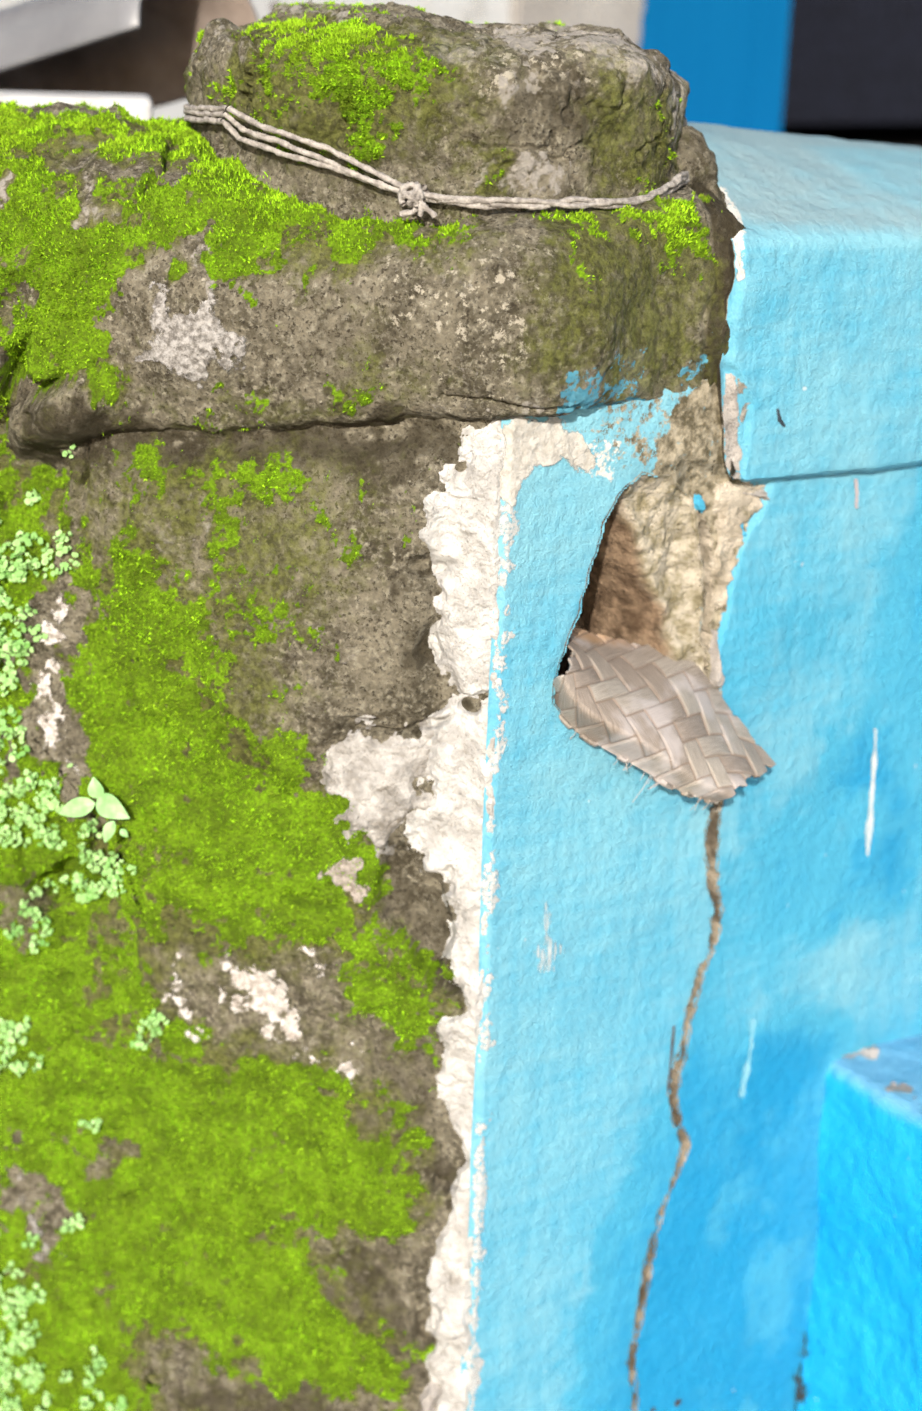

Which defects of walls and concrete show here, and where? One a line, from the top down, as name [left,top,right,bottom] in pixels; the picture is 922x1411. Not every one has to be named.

spalling [693,373,770,610]
crack [696,510,722,694]
spalling [707,629,725,688]
spalling [318,417,596,1411]
crack [626,800,724,1411]
peeling [842,1045,879,1060]
peeling [885,1081,916,1098]
mould [792,1320,812,1411]